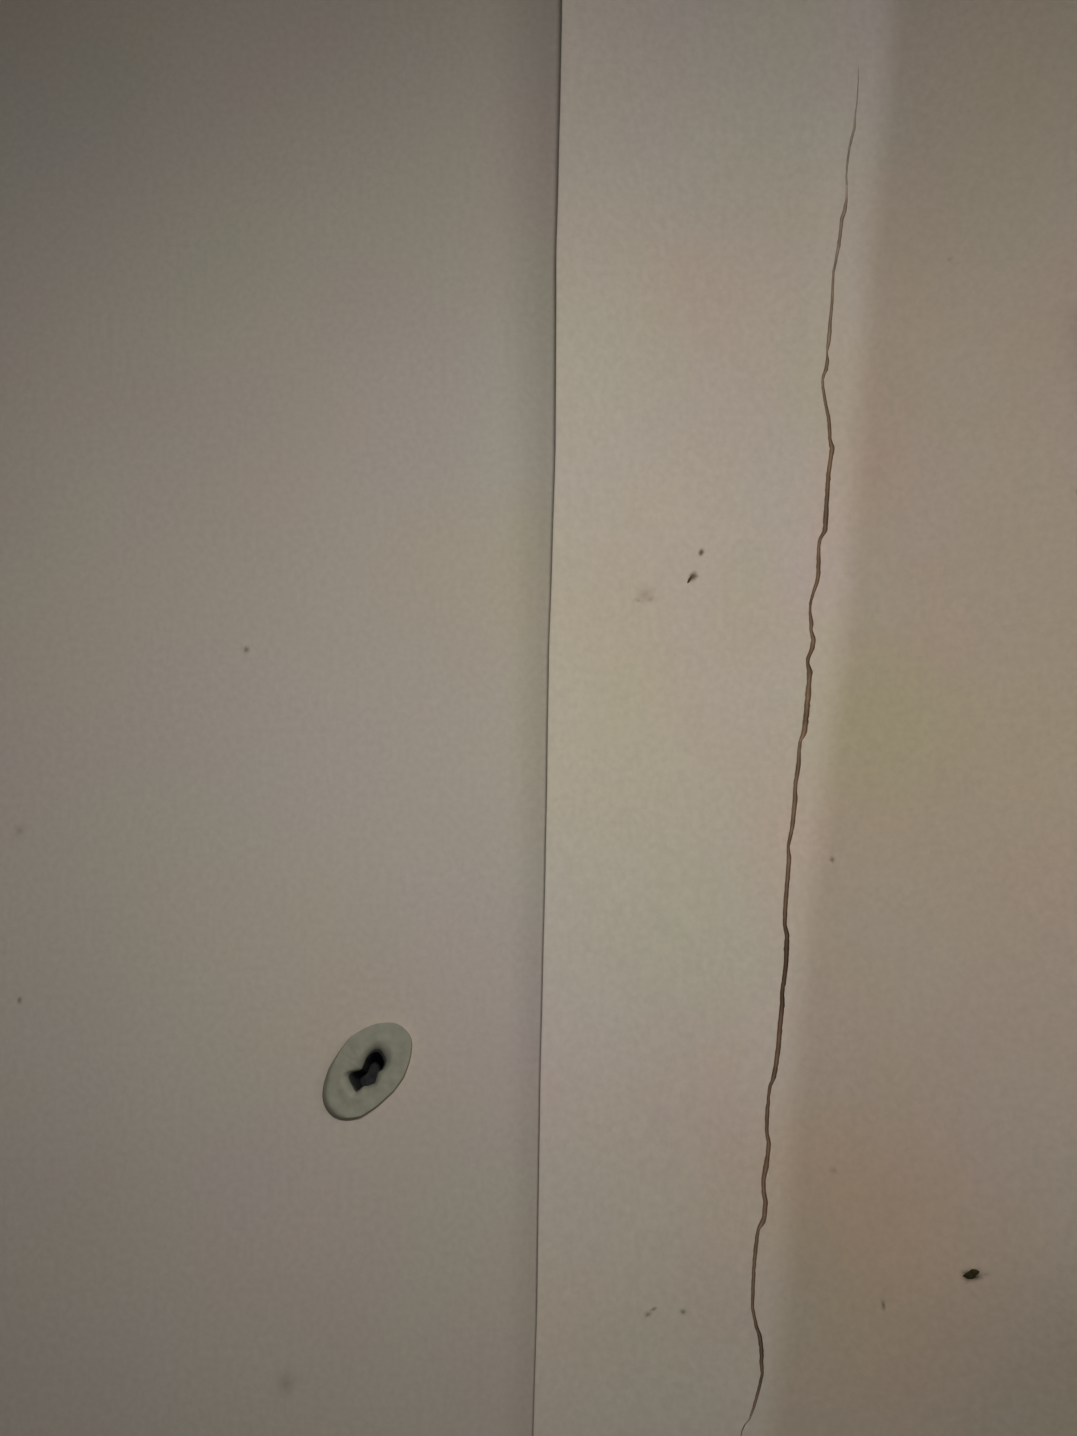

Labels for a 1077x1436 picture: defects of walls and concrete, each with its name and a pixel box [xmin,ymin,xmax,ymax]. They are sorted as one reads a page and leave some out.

crack [741,71,859,1436]